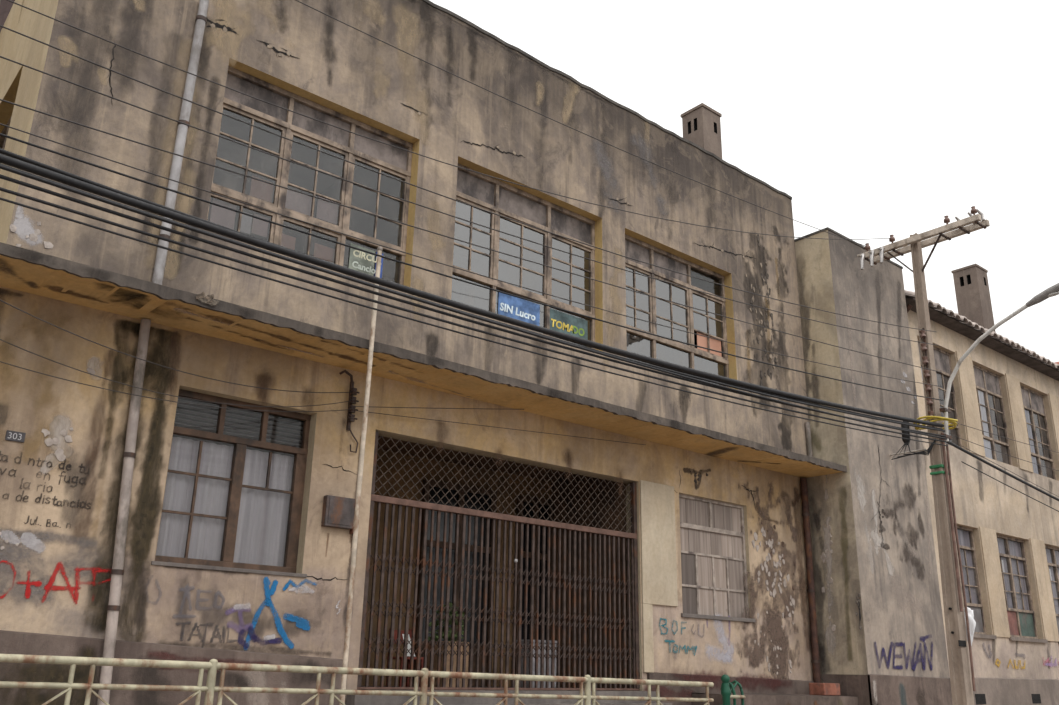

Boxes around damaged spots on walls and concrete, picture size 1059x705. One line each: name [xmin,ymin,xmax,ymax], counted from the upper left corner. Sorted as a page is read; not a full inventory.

leakage [187,0,225,67]
crack [206,17,300,59]
crack [108,42,116,107]
crack [461,140,526,158]
leakage [146,168,167,242]
leakage [165,190,200,278]
leakage [0,262,98,301]
leakage [182,308,381,367]
peeling [41,415,73,473]
leakage [0,320,173,642]
peeling [0,531,43,552]
peeling [738,484,802,680]